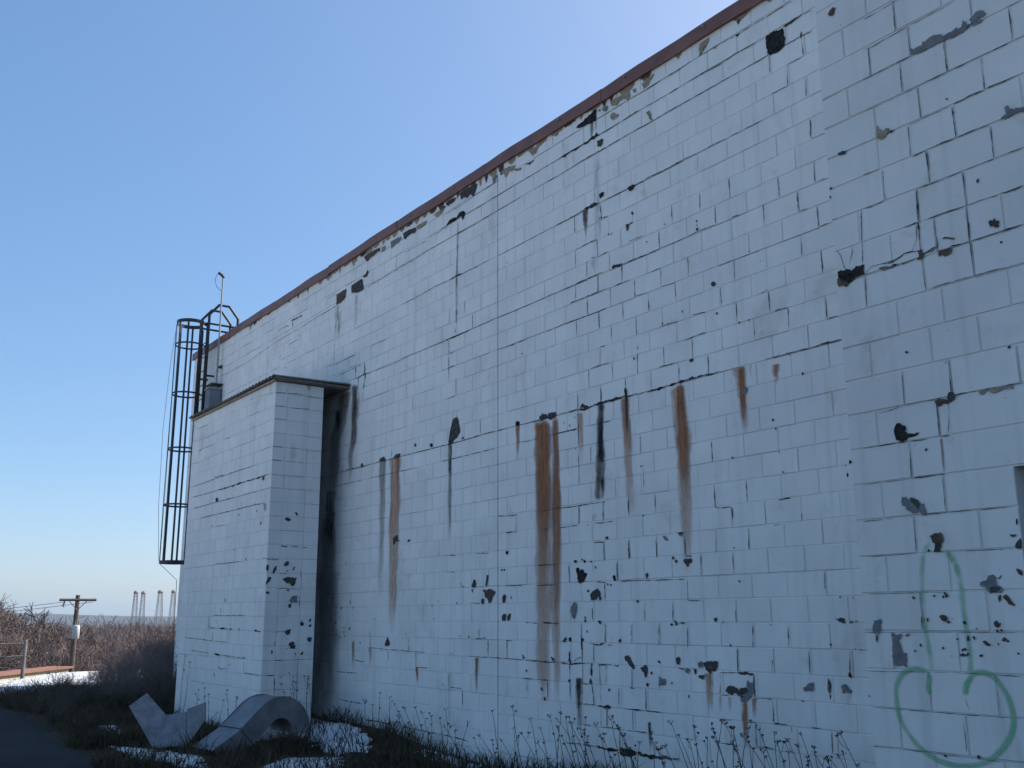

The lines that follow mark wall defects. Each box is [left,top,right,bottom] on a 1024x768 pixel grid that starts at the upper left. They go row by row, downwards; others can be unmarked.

peeling [765,28,785,55]
peeling [910,10,986,55]
peeling [288,72,654,305]
crack [763,171,828,227]
crack [801,0,1022,302]
water stain [596,404,604,498]
corrosion [673,386,690,522]
corrosion [736,368,745,408]
peeling [893,423,919,442]
corrosion [389,458,400,603]
corrosion [535,420,560,677]
peeling [574,559,616,600]